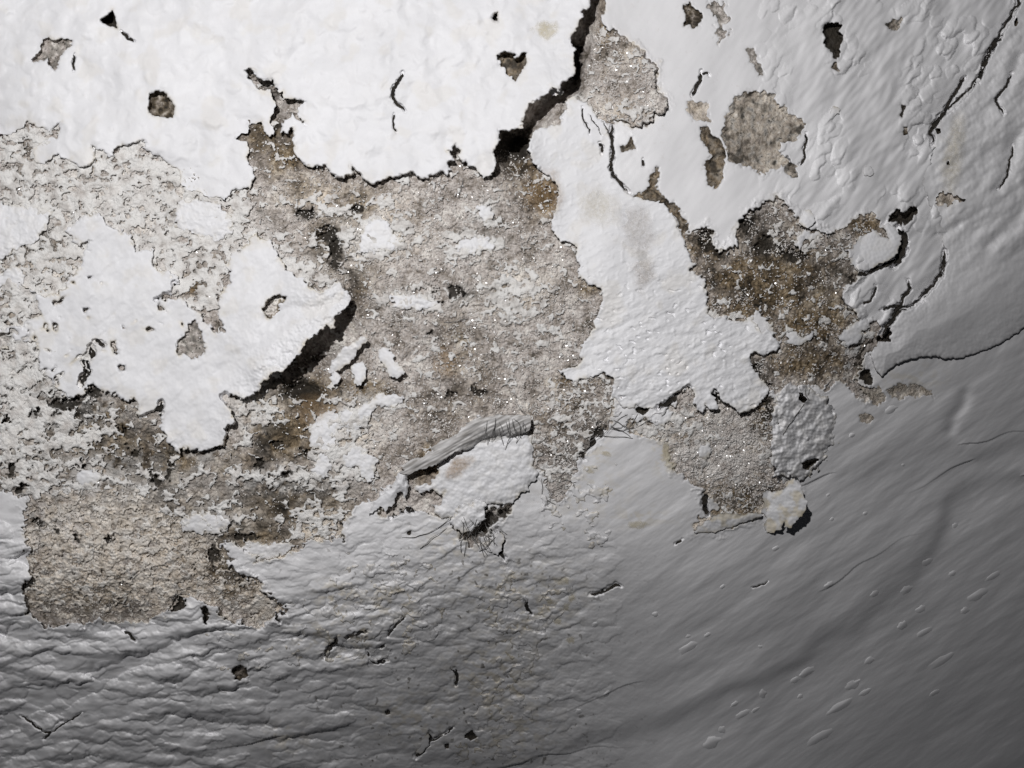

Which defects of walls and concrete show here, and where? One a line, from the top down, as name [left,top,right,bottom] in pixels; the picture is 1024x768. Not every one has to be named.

crack [928,0,1021,144]
peeling [0,0,933,629]
peeling [301,553,447,669]
peeling [454,560,573,765]